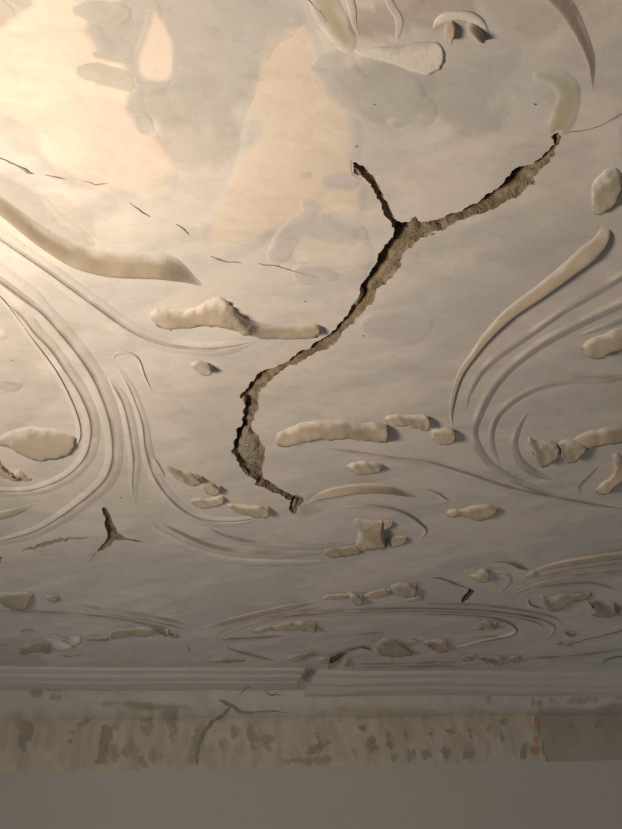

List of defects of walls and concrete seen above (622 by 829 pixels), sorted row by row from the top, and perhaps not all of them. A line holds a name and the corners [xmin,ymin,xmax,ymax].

damp [308,0,357,54]
damp [532,68,582,136]
crack [0,158,108,186]
peeling [194,25,439,286]
crack [211,256,316,278]
crack [231,113,622,514]
crack [434,577,474,603]
crack [330,647,370,662]
damp [66,697,193,770]
crack [195,686,288,765]
damp [330,701,476,764]